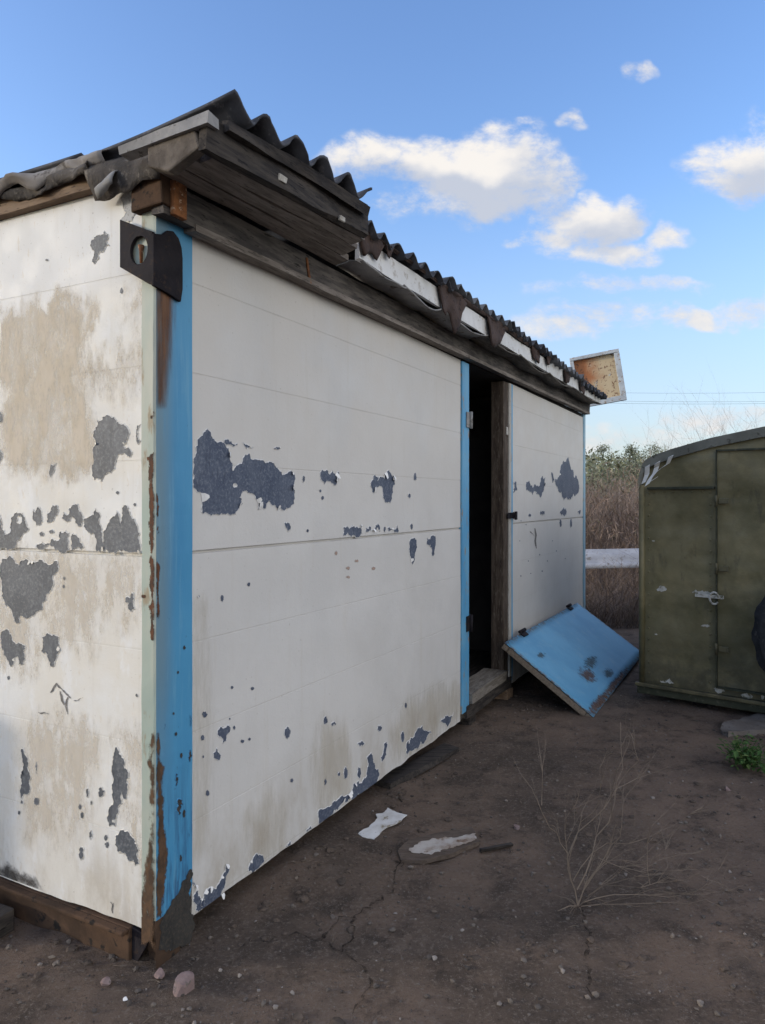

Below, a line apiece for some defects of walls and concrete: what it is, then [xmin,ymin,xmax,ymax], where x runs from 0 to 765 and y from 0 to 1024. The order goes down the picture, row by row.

peeling [90,230,109,265]
damp [0,291,136,483]
corrosion [150,290,171,419]
peeling [0,491,141,680]
peeling [92,414,141,482]
corrosion [141,452,160,641]
peeling [192,428,305,531]
peeling [370,470,396,503]
peeling [513,458,581,528]
peeling [78,746,140,866]
corrosion [141,734,168,946]
peeling [159,855,230,952]